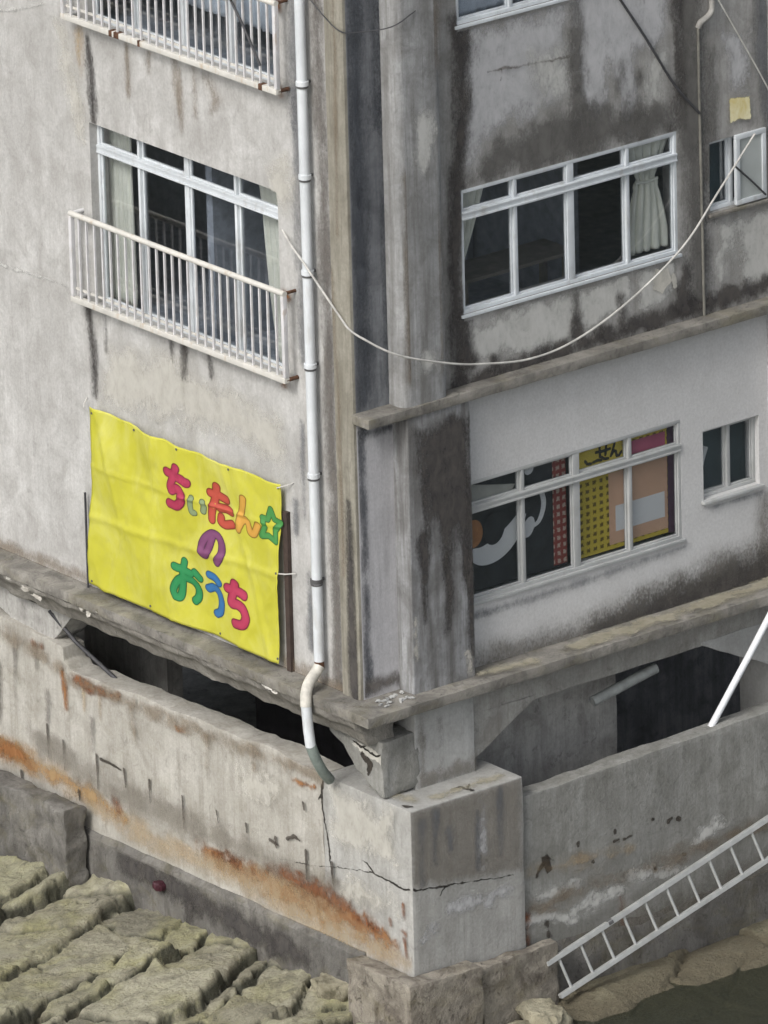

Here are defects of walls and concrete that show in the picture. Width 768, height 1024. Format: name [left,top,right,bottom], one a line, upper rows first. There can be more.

leakage [86,36,96,124]
leakage [289,0,299,174]
crack [495,55,570,71]
leakage [448,0,768,389]
leakage [311,0,400,700]
leakage [415,415,768,675]
rust [60,670,120,709]
rust [0,737,127,823]
spalling [352,742,381,776]
rust [201,846,407,955]
crack [295,781,511,896]
spalling [535,854,552,878]